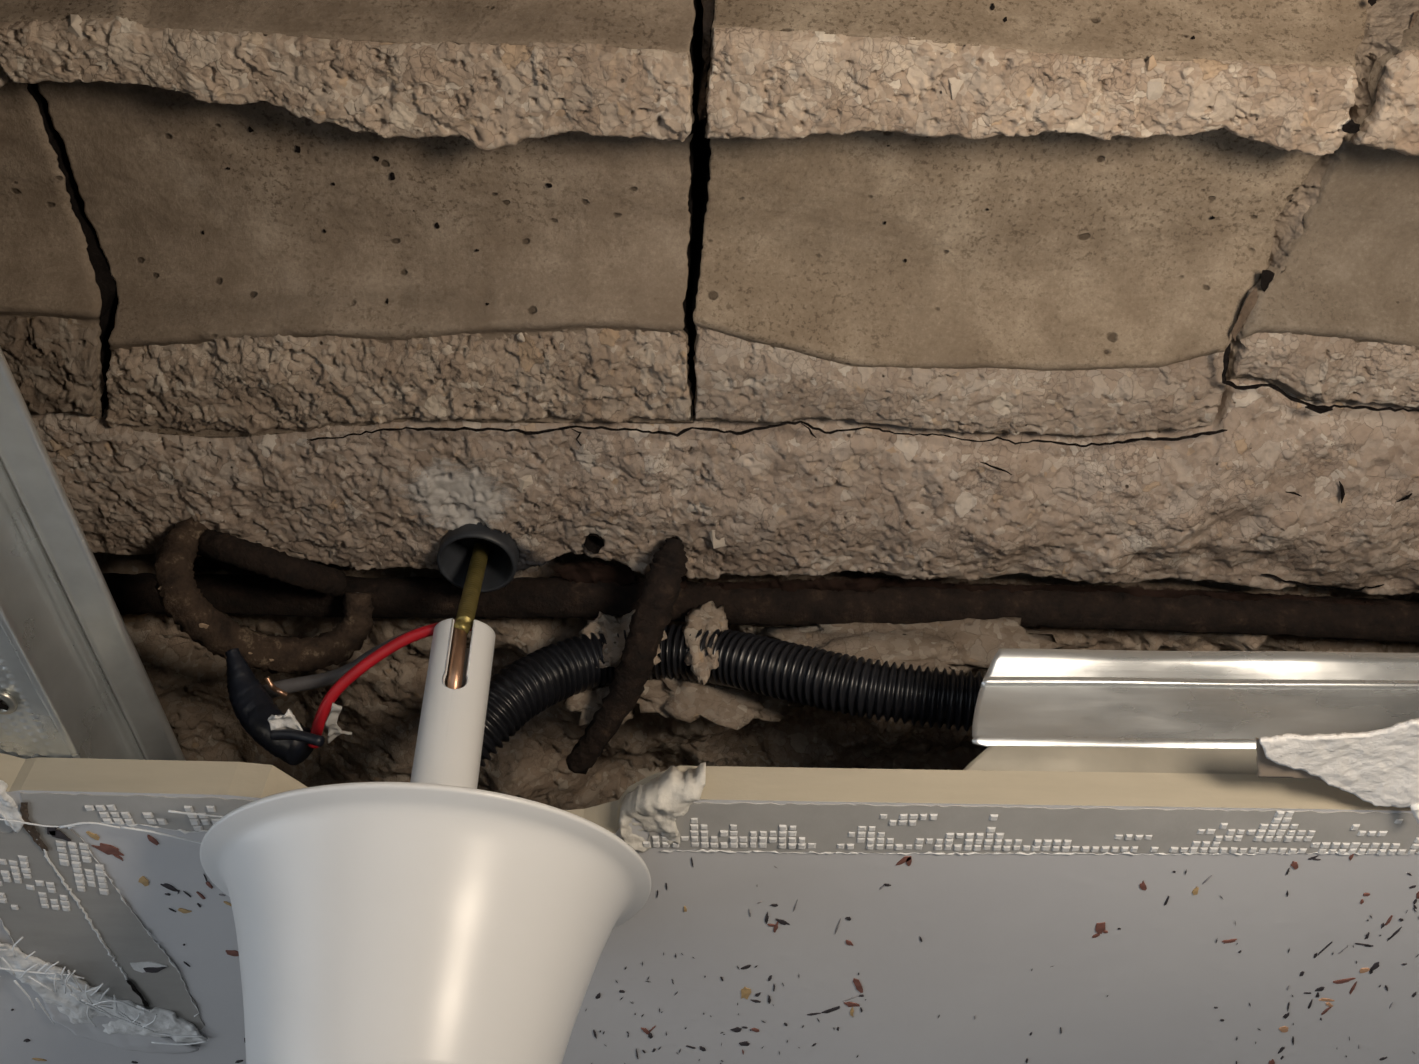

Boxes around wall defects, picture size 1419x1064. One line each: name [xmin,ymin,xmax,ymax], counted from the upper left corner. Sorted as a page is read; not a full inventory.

spalling [0,14,1419,157]
crack [12,80,119,418]
crack [307,0,1228,475]
spalling [0,315,1419,437]
crack [1222,343,1419,414]